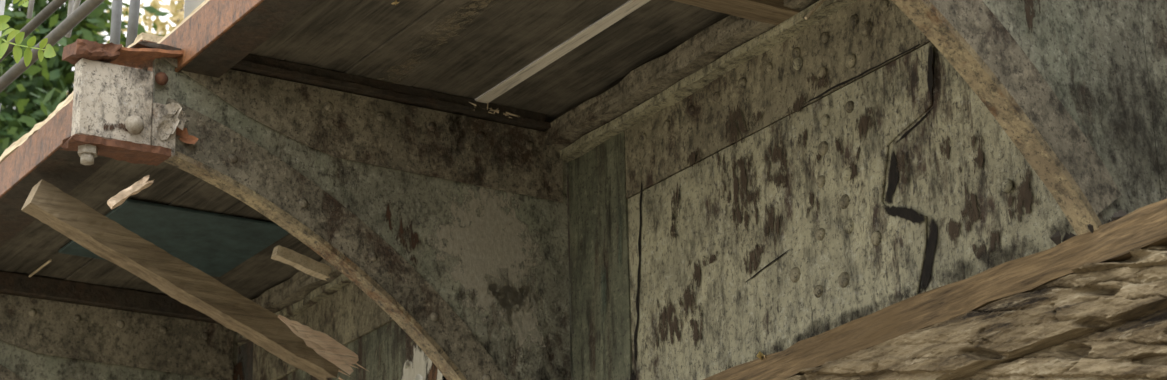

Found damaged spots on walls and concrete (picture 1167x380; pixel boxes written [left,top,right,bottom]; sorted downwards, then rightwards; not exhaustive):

rust [103,123,128,131]
crack [806,44,938,294]
crack [630,182,642,380]
damp [942,239,1033,282]
damp [796,305,877,343]
peeling [401,345,447,380]